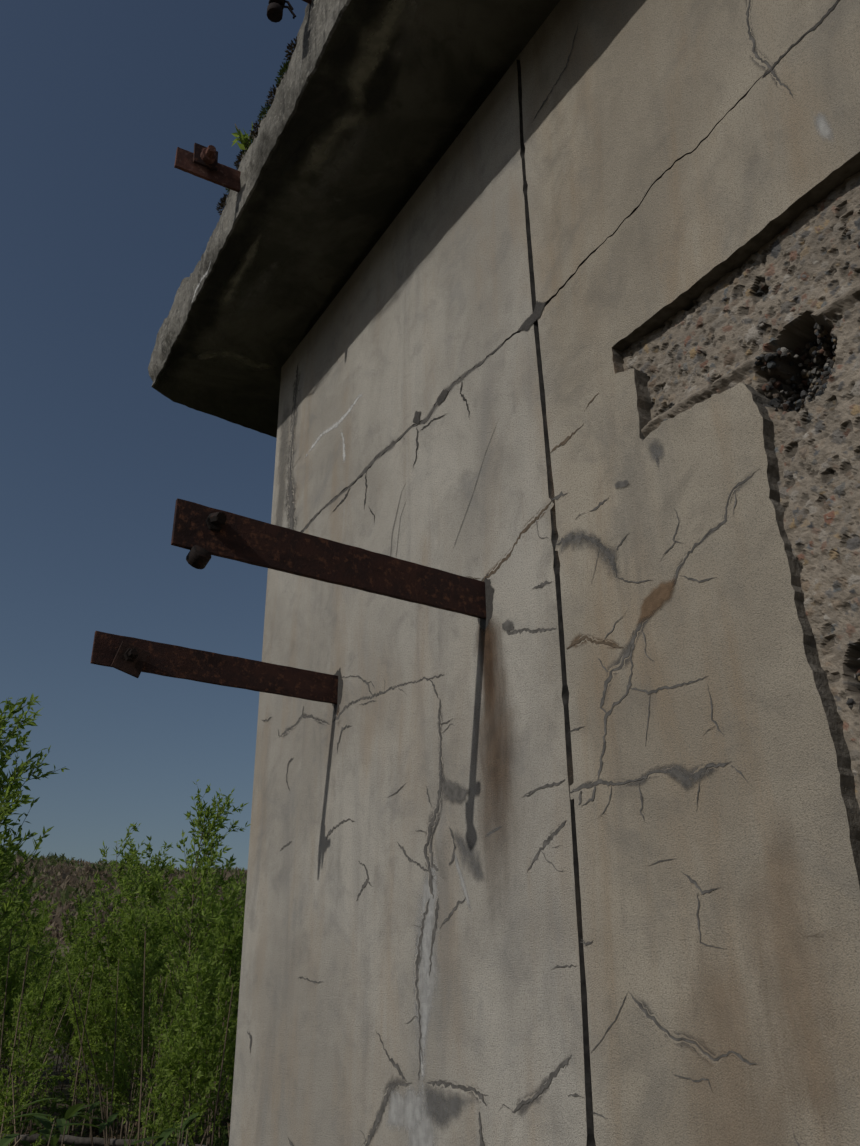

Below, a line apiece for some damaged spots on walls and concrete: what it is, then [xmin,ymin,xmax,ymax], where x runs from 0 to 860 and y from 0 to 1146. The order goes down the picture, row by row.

leakage [156,0,409,380]
leakage [301,68,507,340]
crack [286,0,839,532]
spalling [622,171,860,808]
crack [262,671,762,1146]